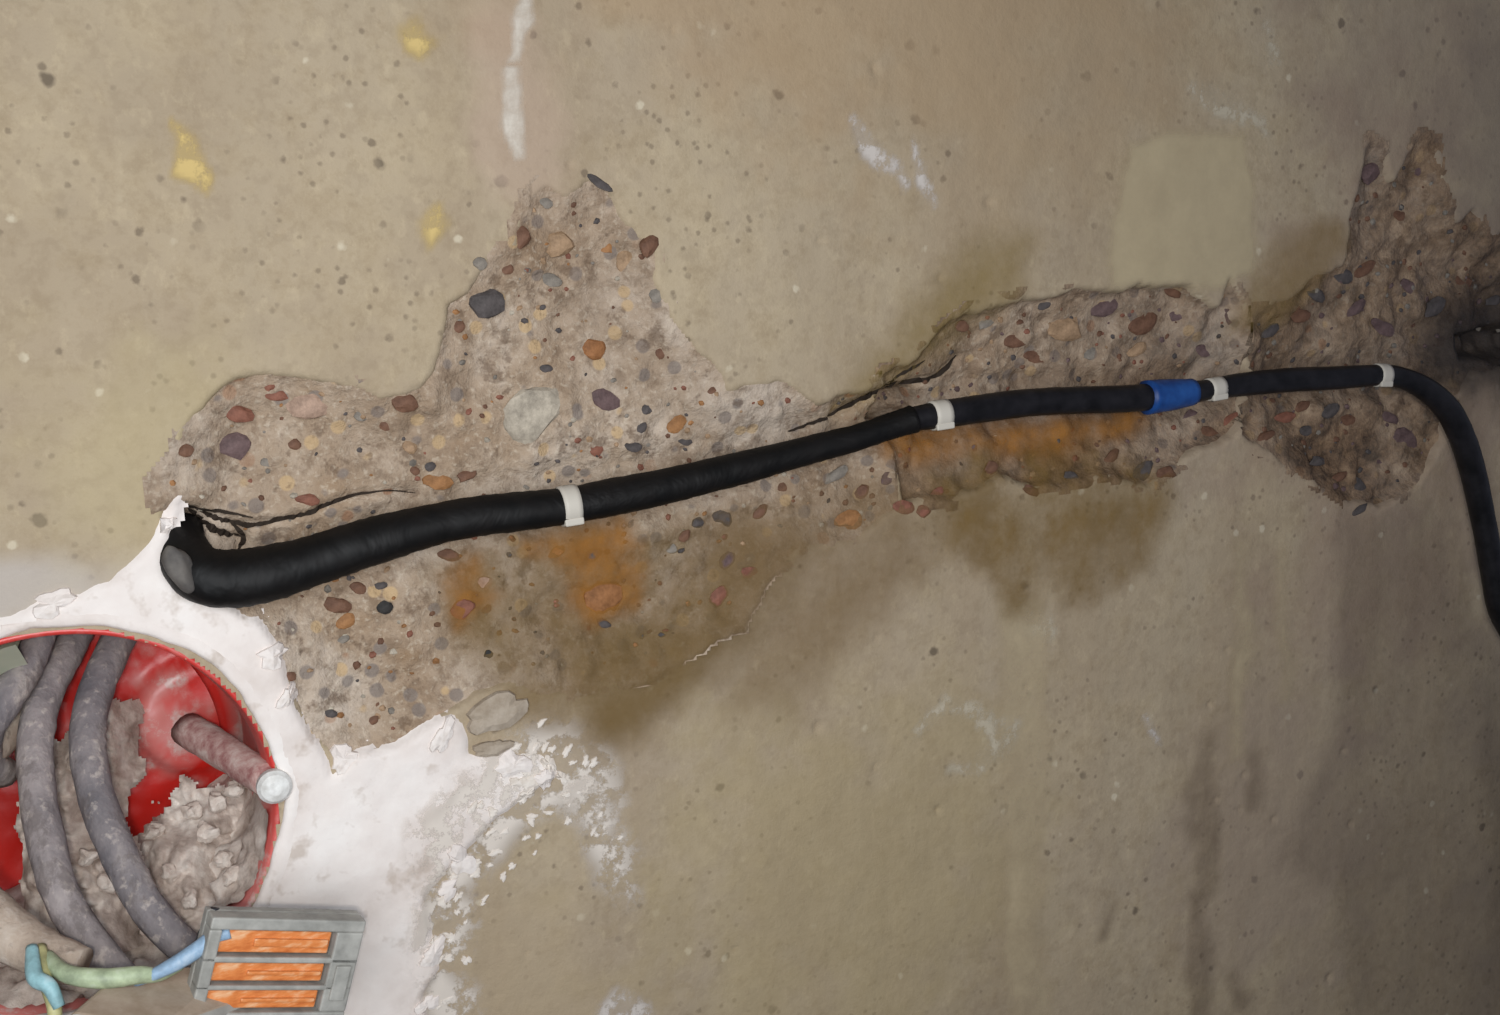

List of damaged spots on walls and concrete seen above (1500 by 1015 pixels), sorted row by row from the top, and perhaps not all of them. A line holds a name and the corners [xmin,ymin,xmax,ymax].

spalling [142,127,1500,550]
crack [788,355,957,432]
rust [884,430,938,456]
rust [970,413,1134,453]
crack [188,490,415,549]
spalling [236,386,1439,775]